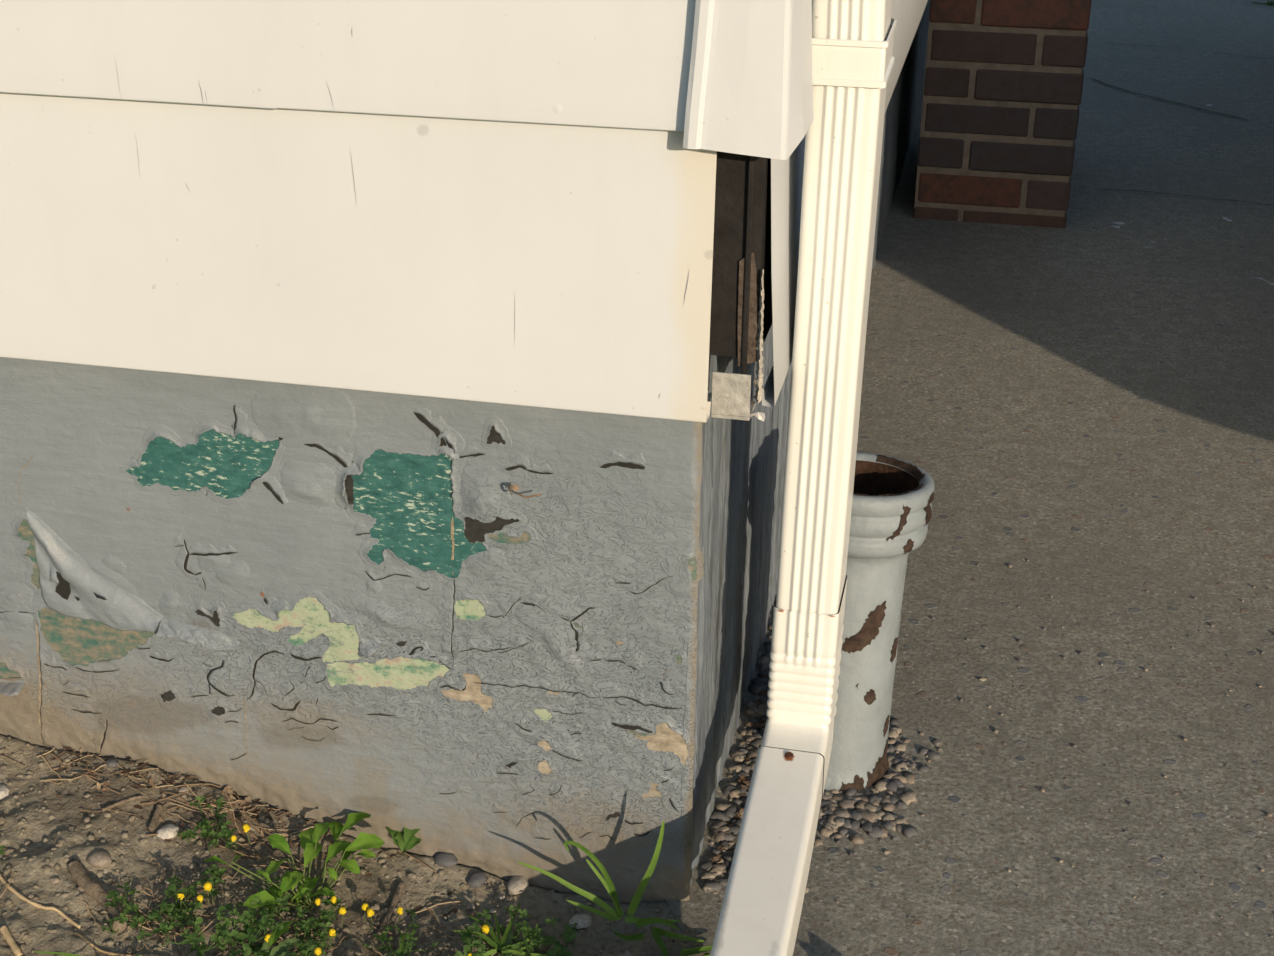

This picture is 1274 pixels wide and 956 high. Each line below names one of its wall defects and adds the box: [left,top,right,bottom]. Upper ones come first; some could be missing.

peeling [119,418,285,505]
crack [414,408,553,474]
peeling [481,415,512,450]
crack [598,450,646,469]
peeling [334,425,539,625]
peeling [11,511,499,716]
peeling [0,656,30,697]
spalling [500,705,558,778]
spalling [620,716,695,771]